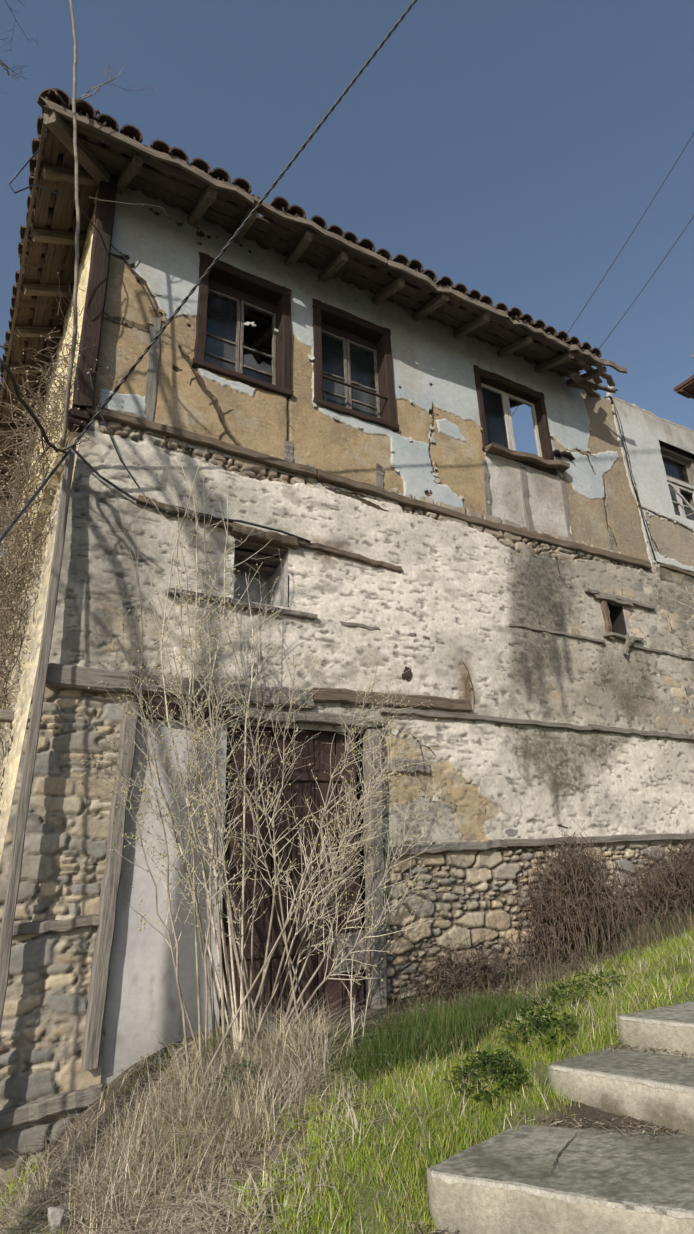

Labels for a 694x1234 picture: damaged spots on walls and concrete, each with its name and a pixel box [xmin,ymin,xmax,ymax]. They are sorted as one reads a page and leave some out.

crack [111,253,162,309]
crack [180,349,237,445]
peeling [94,252,694,588]
damp [518,557,571,695]
damp [511,727,624,810]
crack [551,1132,589,1172]